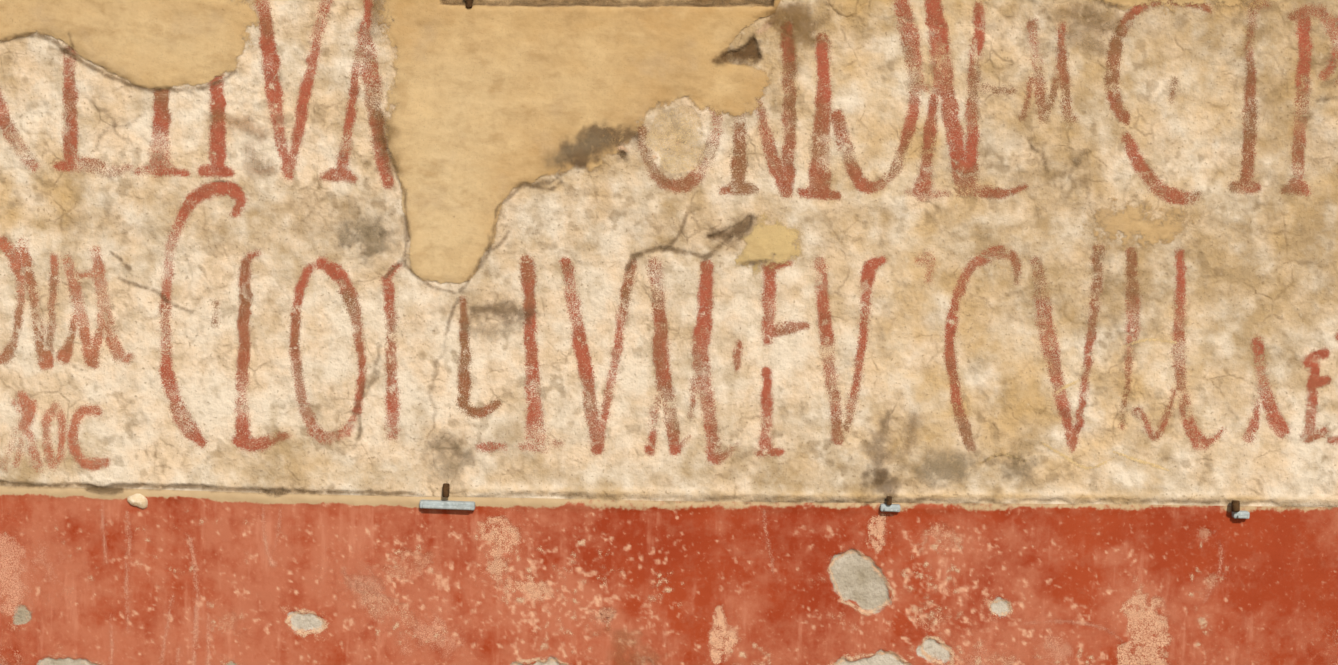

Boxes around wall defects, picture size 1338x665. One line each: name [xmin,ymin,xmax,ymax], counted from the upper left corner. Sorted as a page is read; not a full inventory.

flaking render [713,15,776,63]
flaking render [708,216,754,239]
peeling [475,515,622,665]
flaking render [811,511,1049,665]
flaking render [280,605,330,640]